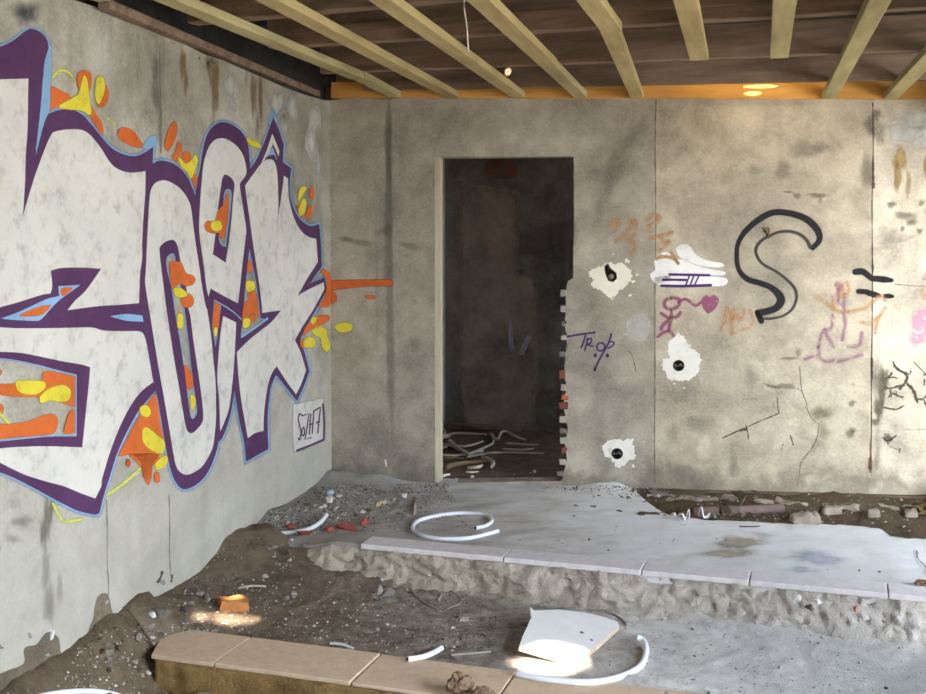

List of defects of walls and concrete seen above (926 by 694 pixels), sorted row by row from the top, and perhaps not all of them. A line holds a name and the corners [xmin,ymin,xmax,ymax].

spalling [557,290,568,476]
crack [722,366,819,486]